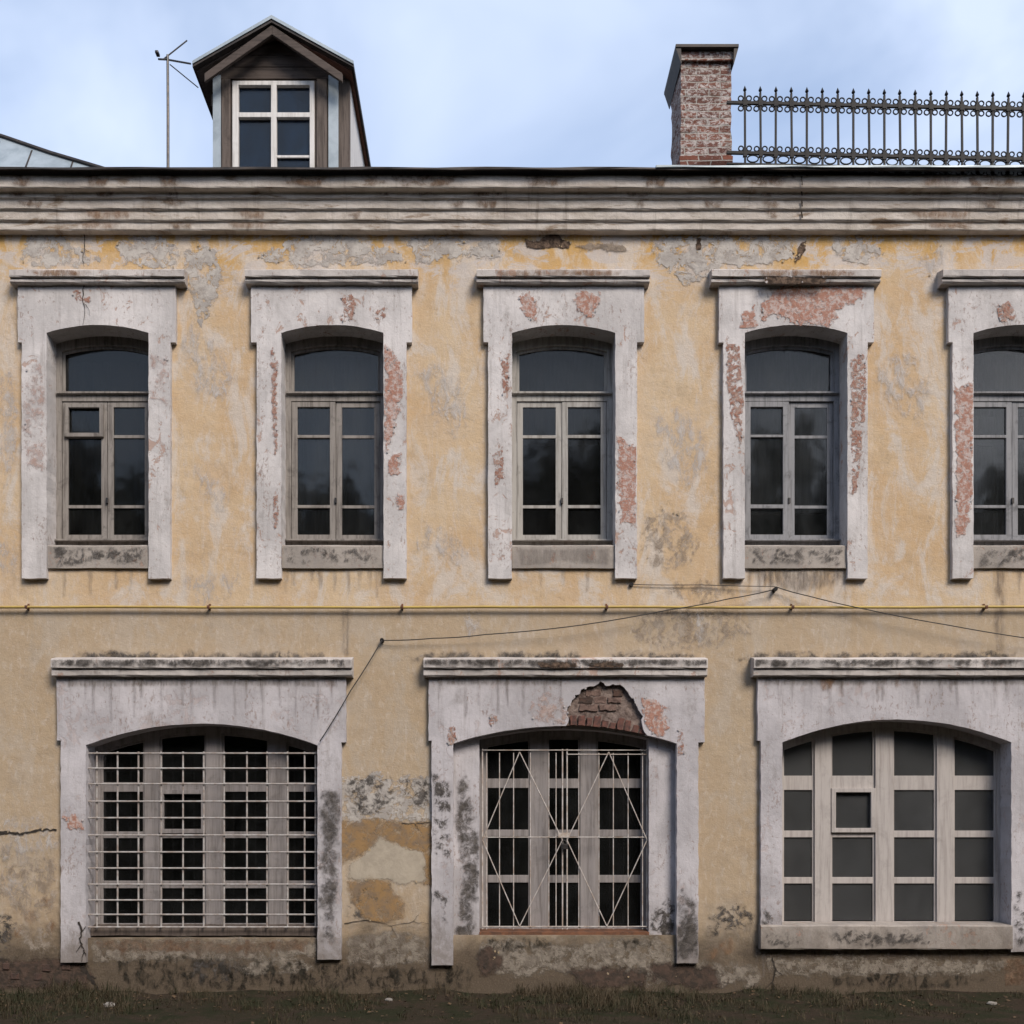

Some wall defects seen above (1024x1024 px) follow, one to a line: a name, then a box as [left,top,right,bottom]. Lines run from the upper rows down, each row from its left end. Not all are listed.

peeling [258,235,503,268]
peeling [651,235,866,328]
peeling [384,344,404,477]
peeling [616,436,697,566]
peeling [726,344,744,442]
peeling [850,353,929,494]
peeling [954,382,973,537]
flaking render [529,682,685,756]
peeling [342,818,432,922]
damp [319,771,479,938]
crack [76,921,100,991]
damp [91,928,470,990]